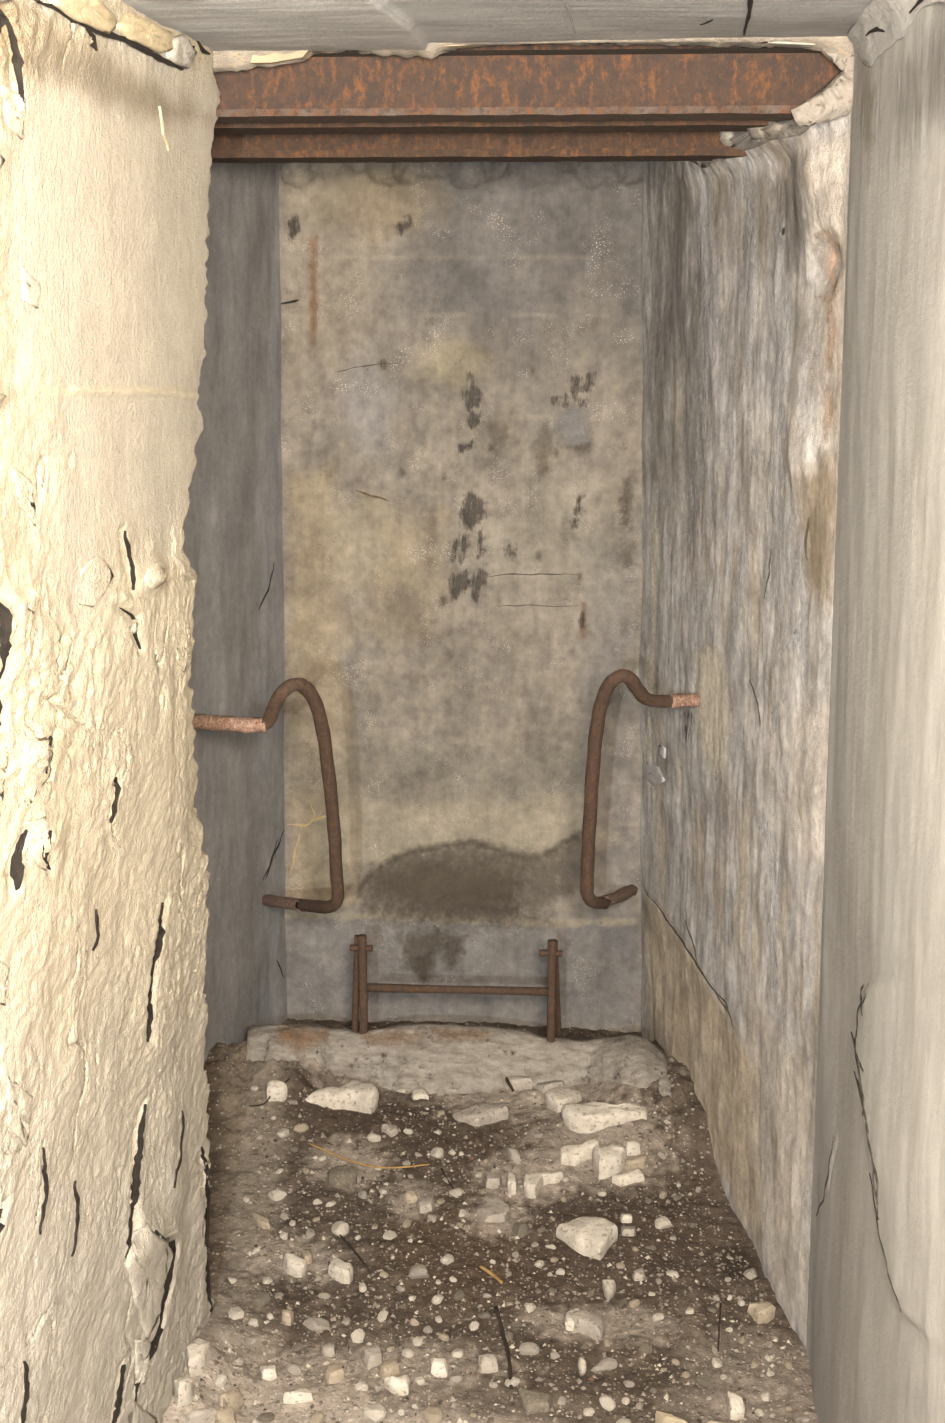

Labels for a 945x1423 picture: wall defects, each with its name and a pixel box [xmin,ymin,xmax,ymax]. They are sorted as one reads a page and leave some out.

peeling [1,84,26,140]
water stain [458,373,481,452]
water stain [551,373,594,406]
peeling [10,465,36,527]
water stain [449,492,487,603]
peeling [75,555,114,607]
peeling [0,736,52,816]
peeling [24,816,52,871]
peeling [0,961,10,1006]
peeling [7,1076,33,1148]
crack [816,983,901,1311]
peeling [116,1399,165,1423]